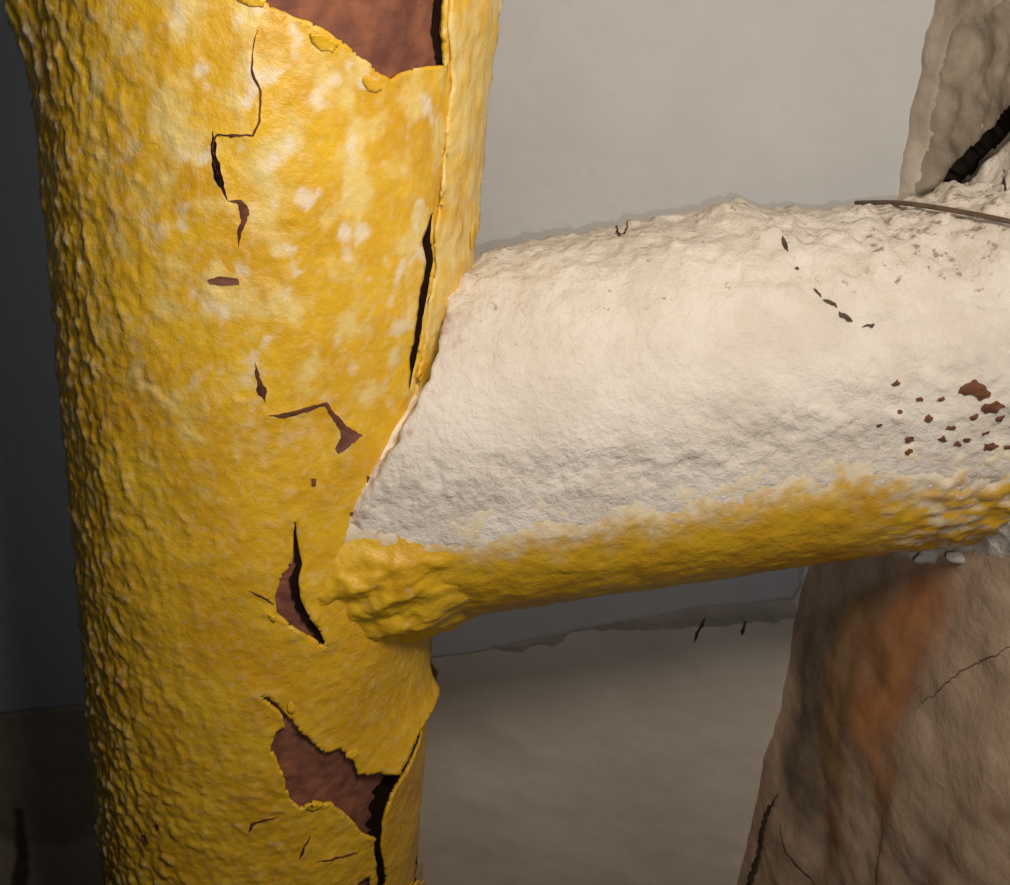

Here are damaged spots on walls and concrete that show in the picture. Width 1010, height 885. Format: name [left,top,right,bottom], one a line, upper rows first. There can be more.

crack [211,30,262,246]
peeling [237,0,502,396]
crack [931,106,1010,191]
peeling [208,276,239,286]
crack [409,214,433,388]
crack [255,364,362,454]
peeling [250,529,324,643]
peeling [264,697,383,834]
crack [746,793,815,885]